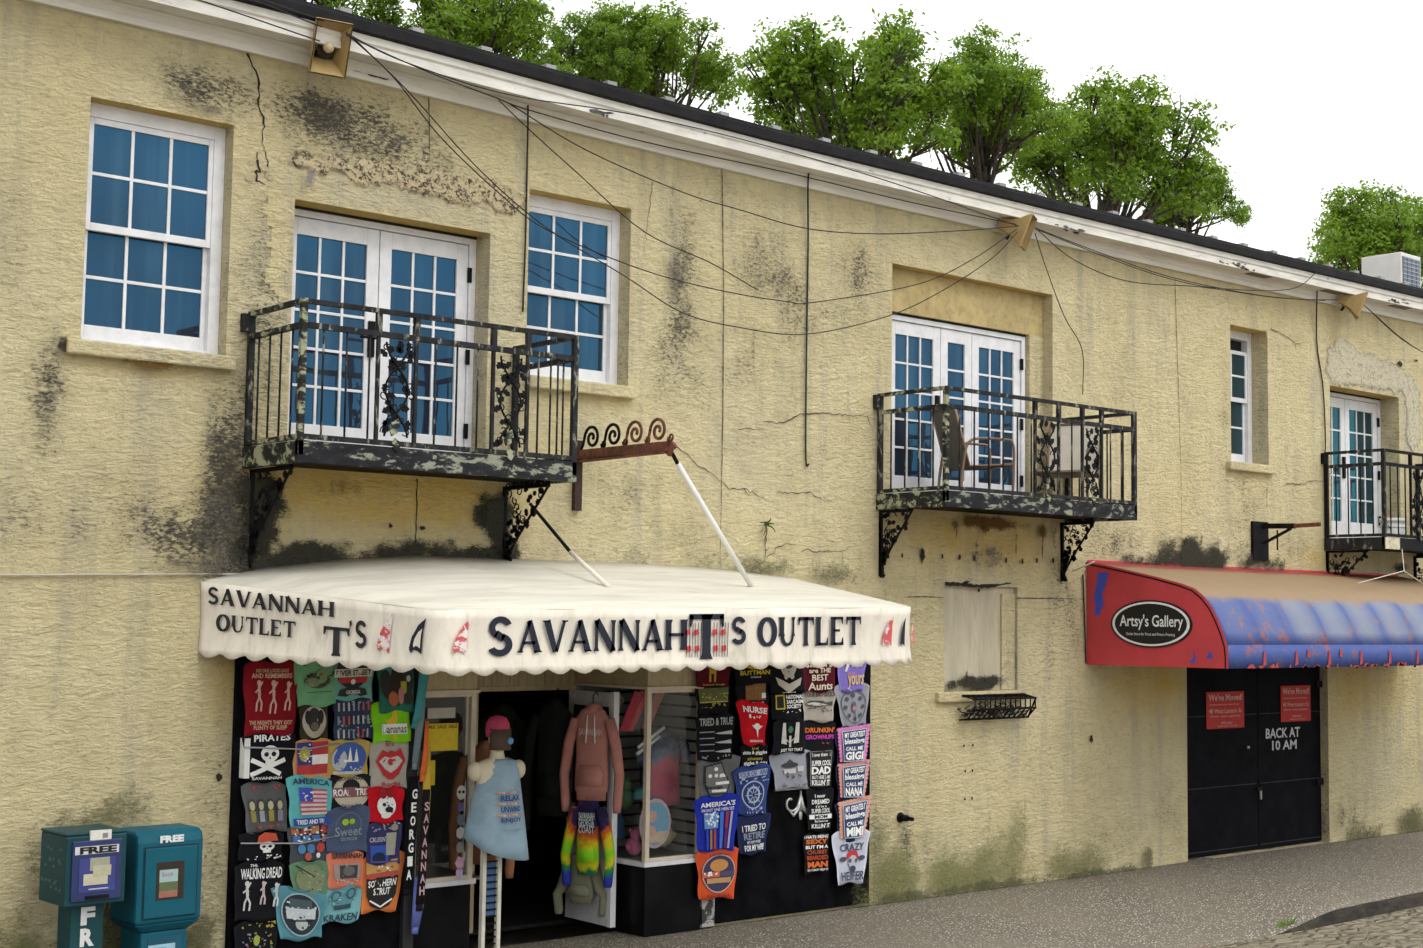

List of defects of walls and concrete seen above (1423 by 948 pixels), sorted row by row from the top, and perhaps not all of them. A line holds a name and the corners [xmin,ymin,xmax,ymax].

crack [245,53,273,185]
leakage [57,336,67,363]
leakage [1122,535,1286,571]